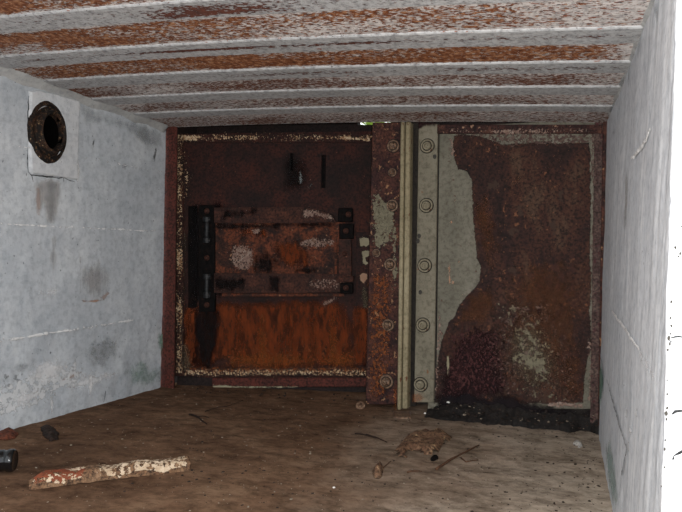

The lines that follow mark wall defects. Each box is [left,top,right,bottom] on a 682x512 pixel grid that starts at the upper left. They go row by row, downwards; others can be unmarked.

rust [0,0,632,98]
rust [116,95,609,129]
peeling [360,193,399,290]
peeling [435,127,594,409]
rust [184,270,393,398]
rust [440,321,513,399]